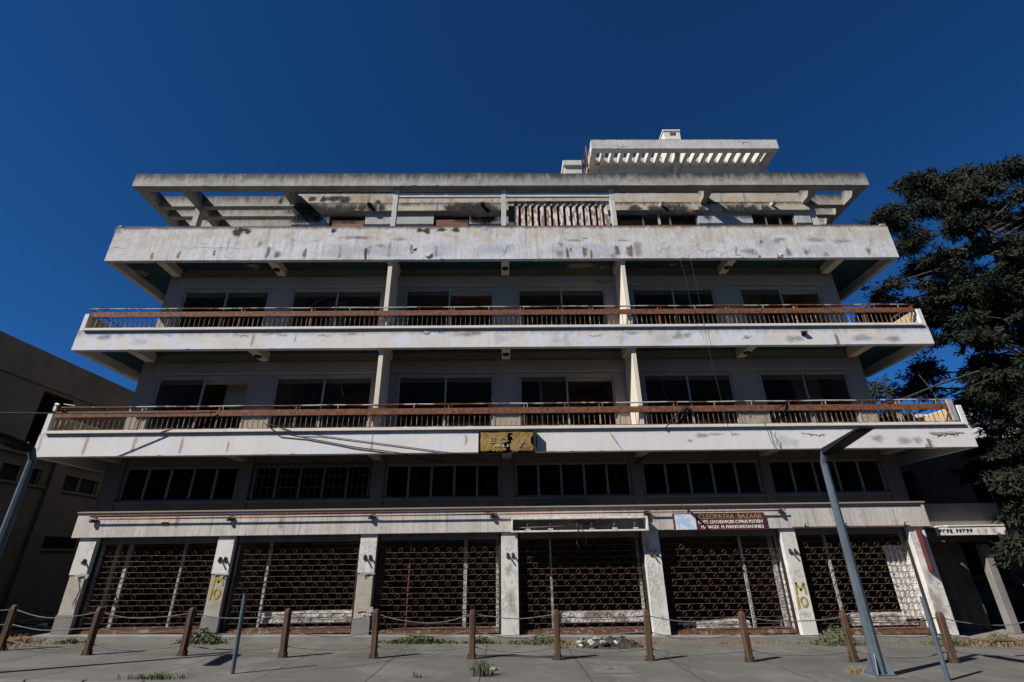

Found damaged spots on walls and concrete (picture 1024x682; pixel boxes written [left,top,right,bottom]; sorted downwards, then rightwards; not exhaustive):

water stain [278,196,390,224]
water stain [444,202,500,224]